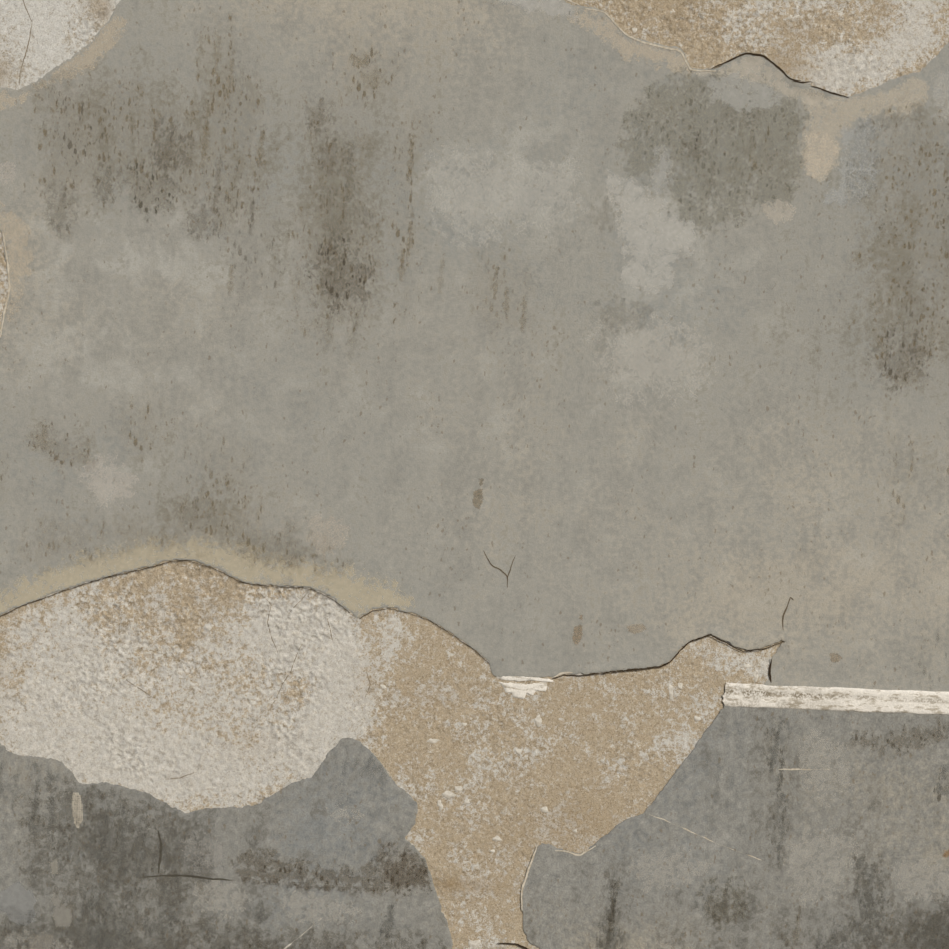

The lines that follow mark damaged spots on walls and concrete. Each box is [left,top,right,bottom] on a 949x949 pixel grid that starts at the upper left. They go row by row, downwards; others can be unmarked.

spalling [0,0,121,90]
spalling [565,0,949,97]
damp [127,163,175,221]
spalling [0,231,10,337]
damp [309,230,374,316]
crack [483,550,516,588]
spalling [0,559,784,949]
damp [231,842,428,895]